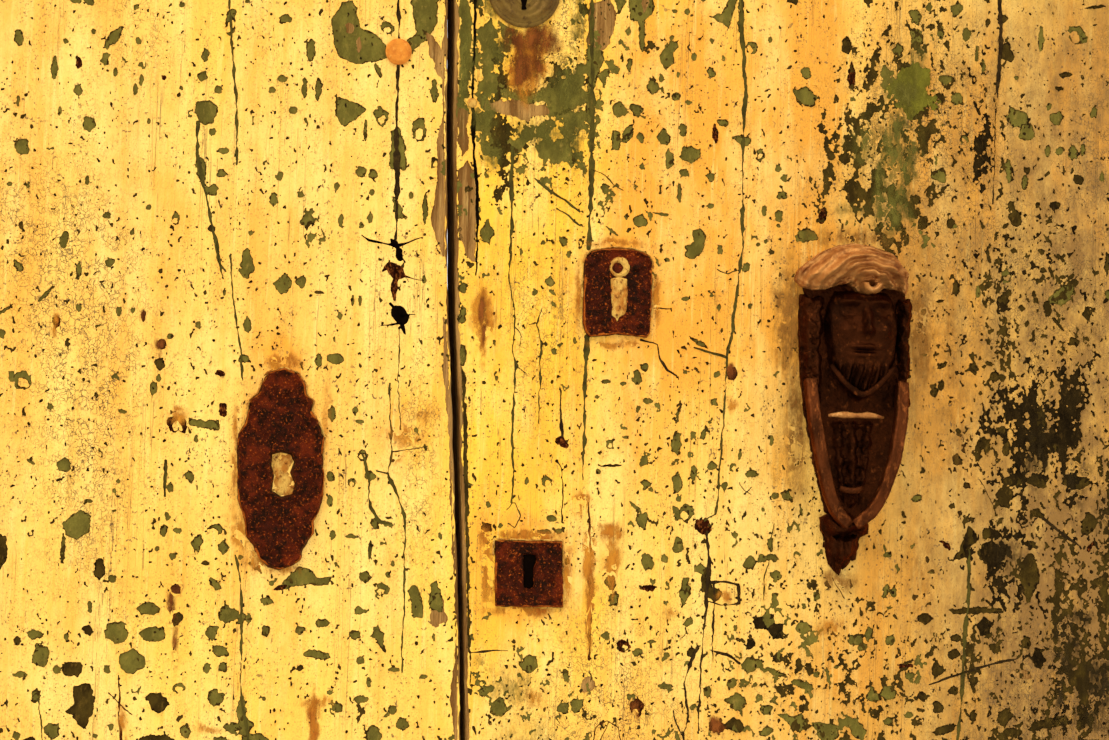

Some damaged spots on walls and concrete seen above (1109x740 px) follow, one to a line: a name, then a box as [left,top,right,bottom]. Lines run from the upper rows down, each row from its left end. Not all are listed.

crack [394,0,402,39]
rust [505,25,558,100]
peeling [0,0,446,328]
rust [269,354,298,370]
crack [362,65,428,673]
crack [673,0,774,740]
rust [479,528,559,599]
rust [496,607,550,616]
crack [36,699,44,740]